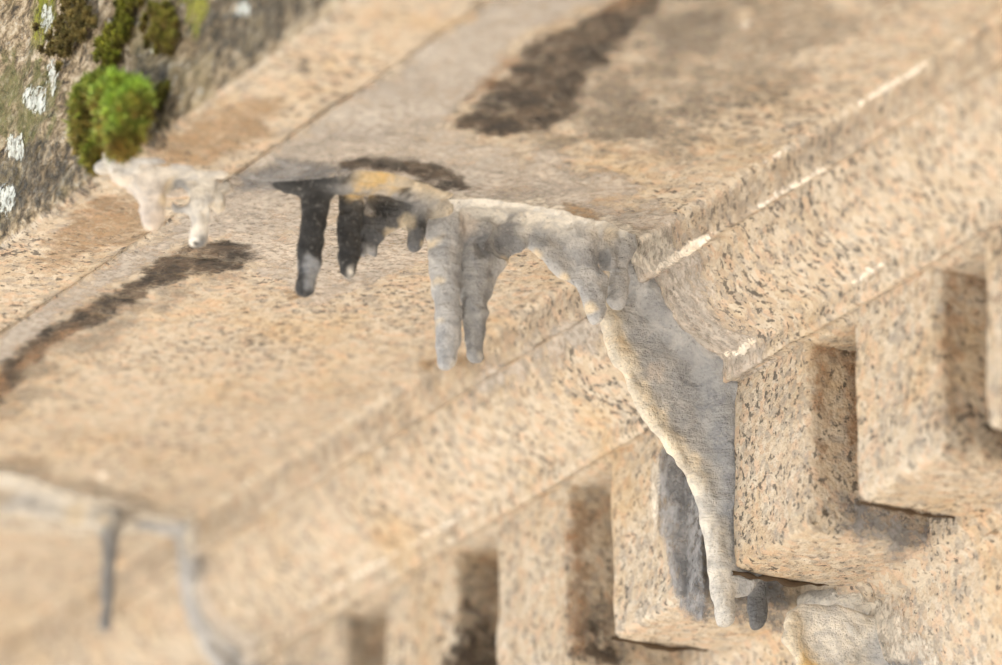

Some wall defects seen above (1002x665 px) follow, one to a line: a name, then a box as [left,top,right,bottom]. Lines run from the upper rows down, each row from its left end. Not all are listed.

water stain [0,0,768,630]
water stain [0,471,243,665]
water stain [440,602,497,665]
water stain [569,620,619,665]
water stain [781,588,921,665]